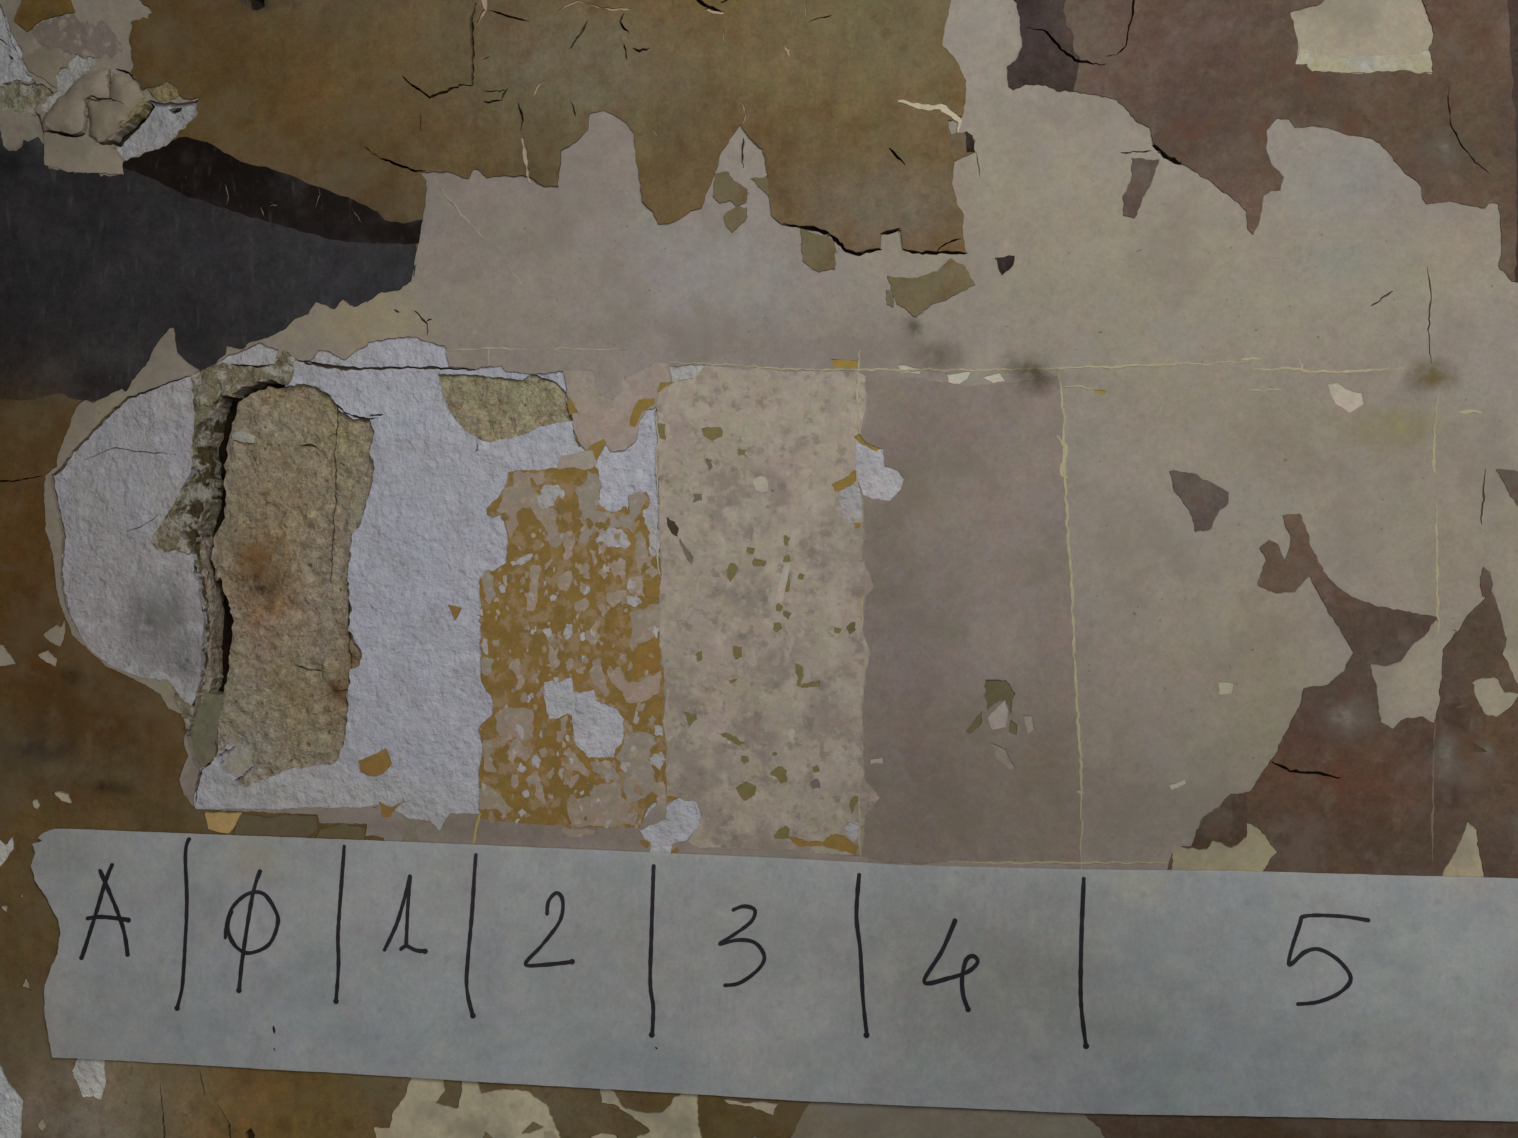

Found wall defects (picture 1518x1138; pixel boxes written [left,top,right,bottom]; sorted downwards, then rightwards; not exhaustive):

crack [696,0,724,14]
flaking render [0,0,199,177]
crack [367,148,418,172]
crack [521,110,531,184]
crack [788,226,964,256]
crack [213,361,473,537]
peeling [33,0,1518,877]
crack [191,587,234,768]
peeling [374,1078,561,1138]
peeling [599,1089,702,1138]
peeling [724,1099,778,1115]
peeling [790,1101,1105,1138]